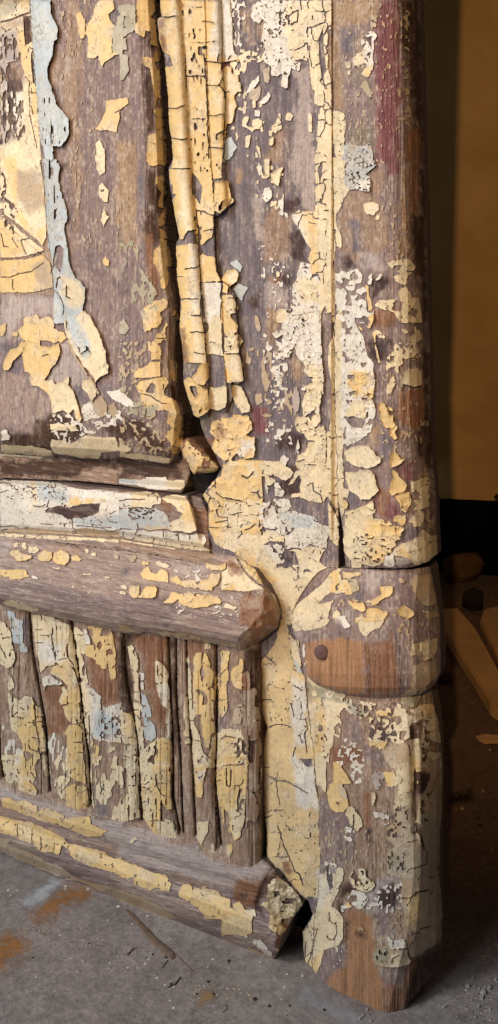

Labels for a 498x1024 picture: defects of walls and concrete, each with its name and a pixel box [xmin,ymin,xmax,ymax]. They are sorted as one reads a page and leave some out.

peeling [0,0,219,474]
peeling [0,569,38,580]
peeling [0,477,210,569]
peeling [76,0,442,973]
peeling [0,600,179,919]